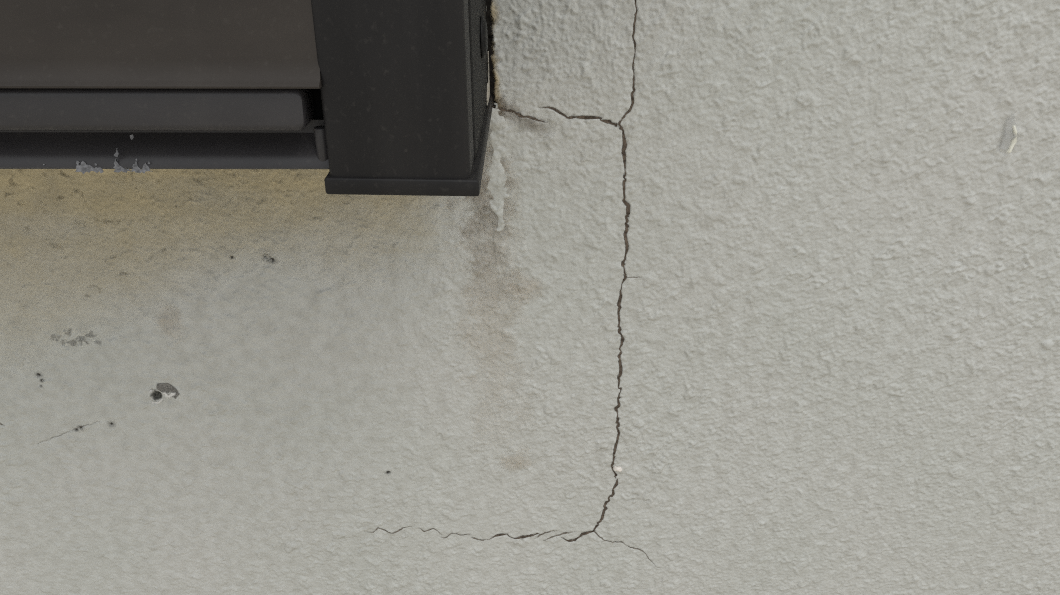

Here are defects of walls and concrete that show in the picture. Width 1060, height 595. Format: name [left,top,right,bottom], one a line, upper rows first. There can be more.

crack [371,0,655,565]